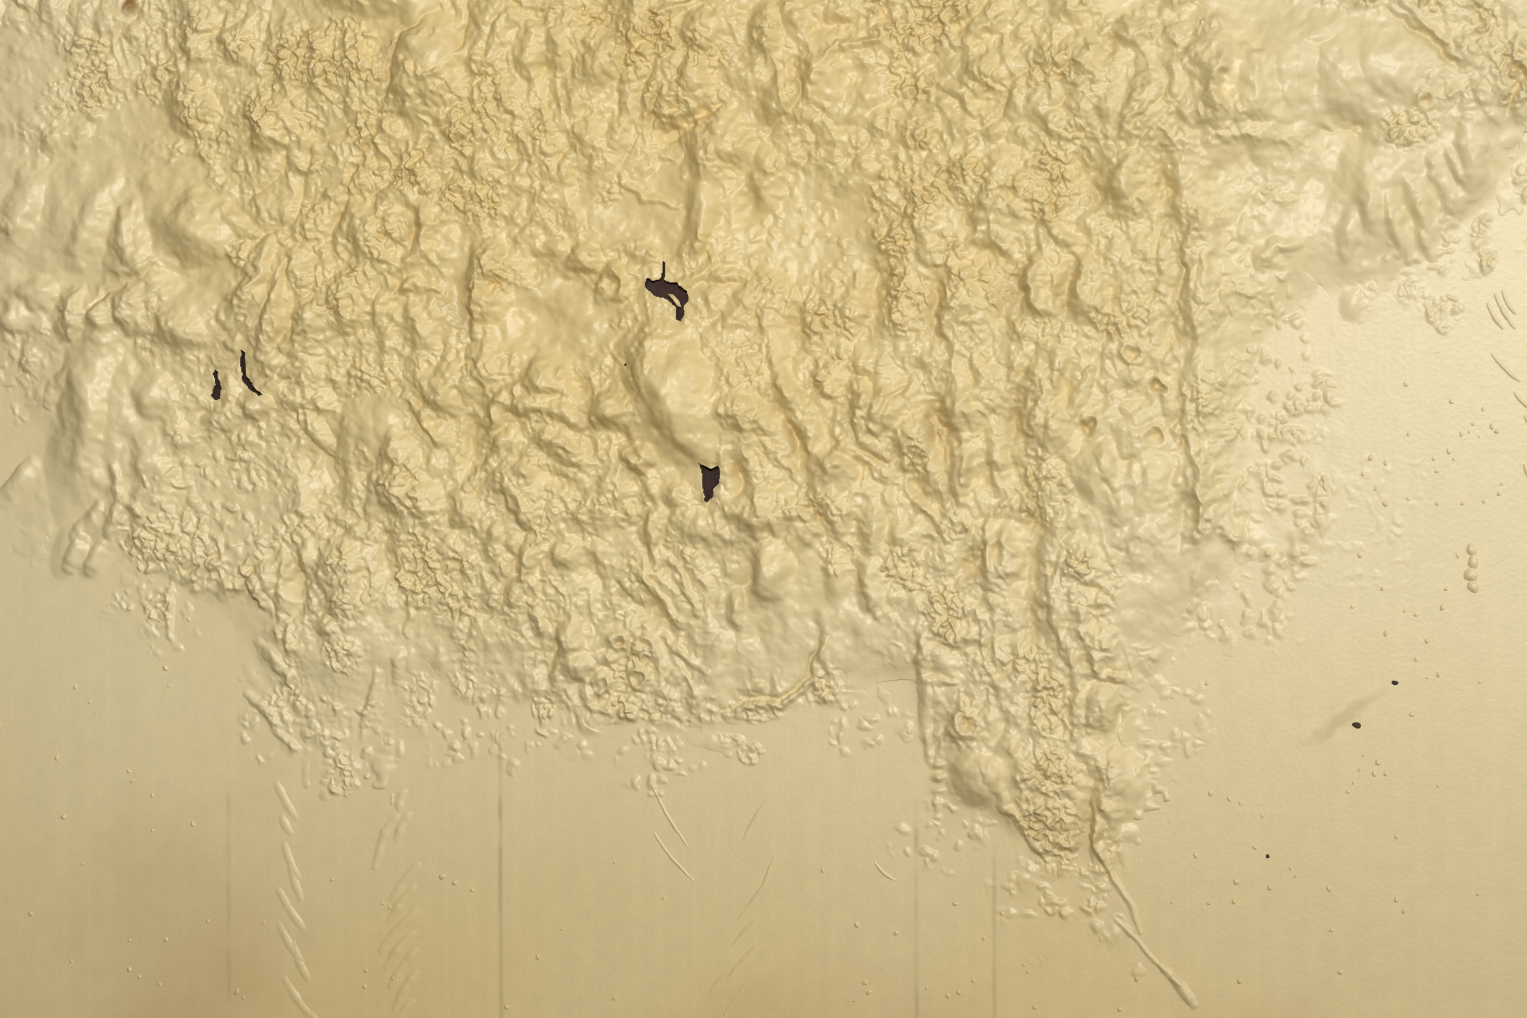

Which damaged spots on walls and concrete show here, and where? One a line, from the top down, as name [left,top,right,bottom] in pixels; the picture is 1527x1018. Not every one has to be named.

peeling [0,0,1212,1010]
peeling [929,0,1446,667]